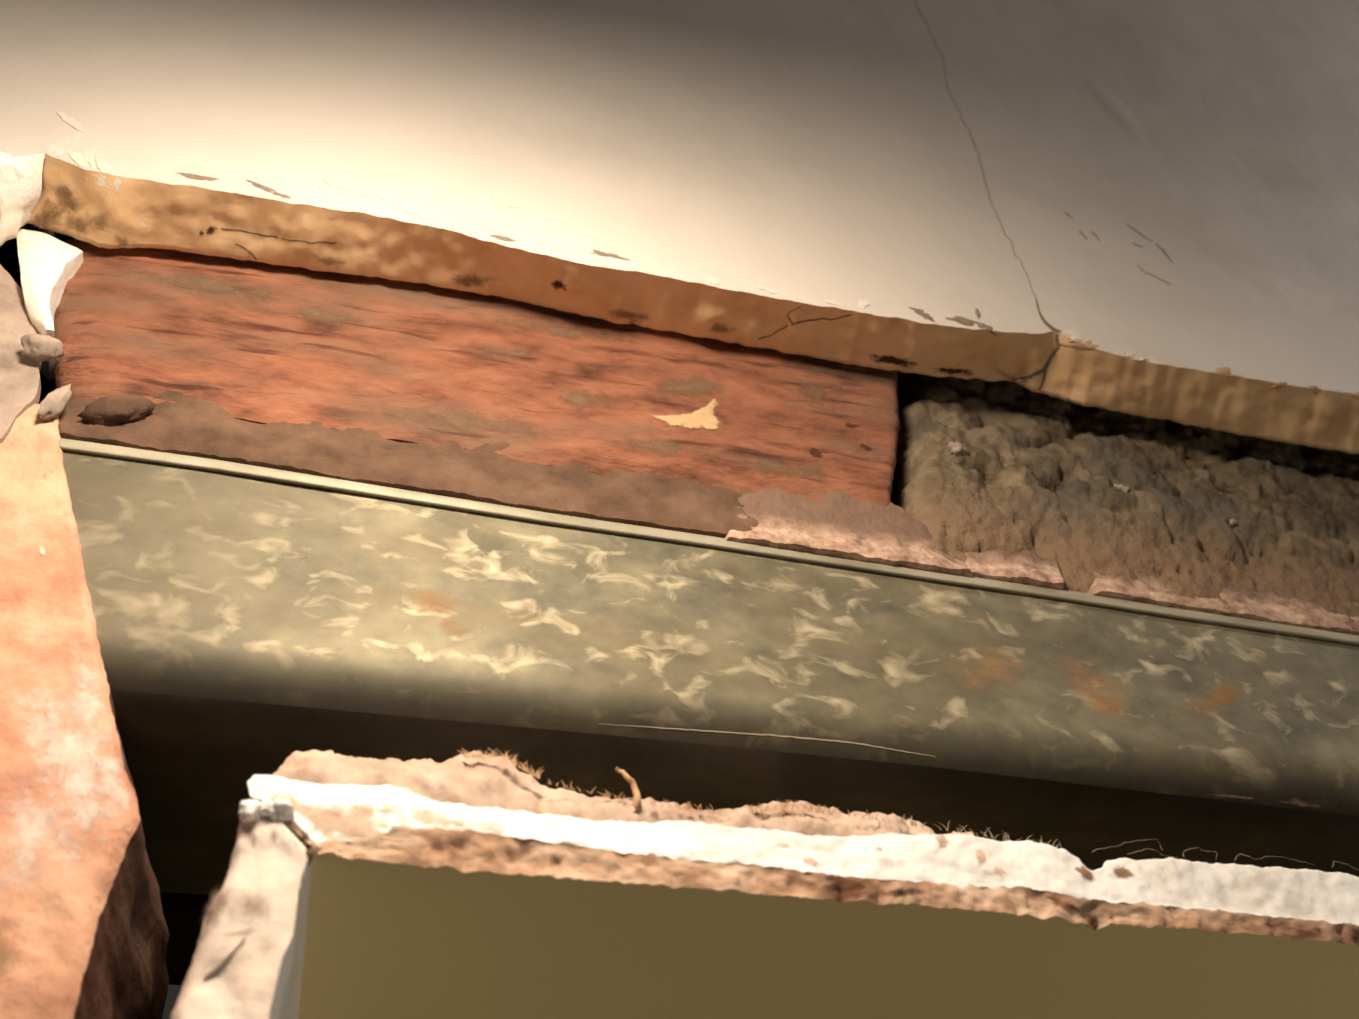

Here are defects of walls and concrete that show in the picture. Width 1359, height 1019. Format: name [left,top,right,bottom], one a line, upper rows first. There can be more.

peeling [176,172,218,182]
peeling [246,180,291,199]
crack [915,0,1095,390]
peeling [462,197,567,247]
peeling [592,249,632,261]
crack [758,306,852,340]
peeling [909,307,998,337]
peeling [1118,350,1160,365]
peeling [1215,367,1359,400]